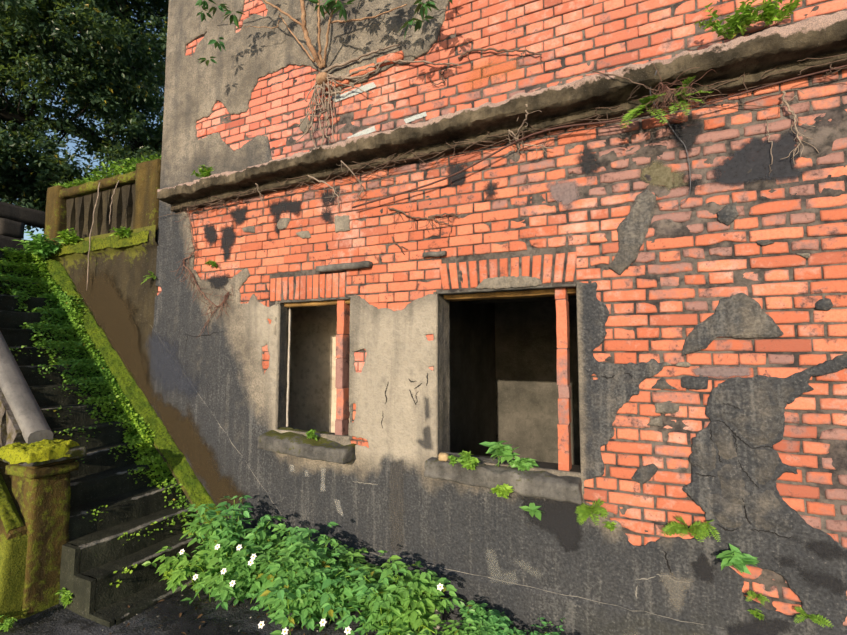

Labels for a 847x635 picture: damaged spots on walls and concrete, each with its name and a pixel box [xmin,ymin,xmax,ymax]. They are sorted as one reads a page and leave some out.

spalling [185,36,204,56]
spalling [196,0,847,160]
water stain [712,131,806,185]
mould [204,206,247,260]
mould [269,199,303,234]
mould [321,191,337,223]
spalling [187,69,847,548]
crack [409,373,428,405]
crack [695,403,794,538]
water stain [522,497,583,553]
peeling [663,576,689,609]
spalling [729,565,802,615]